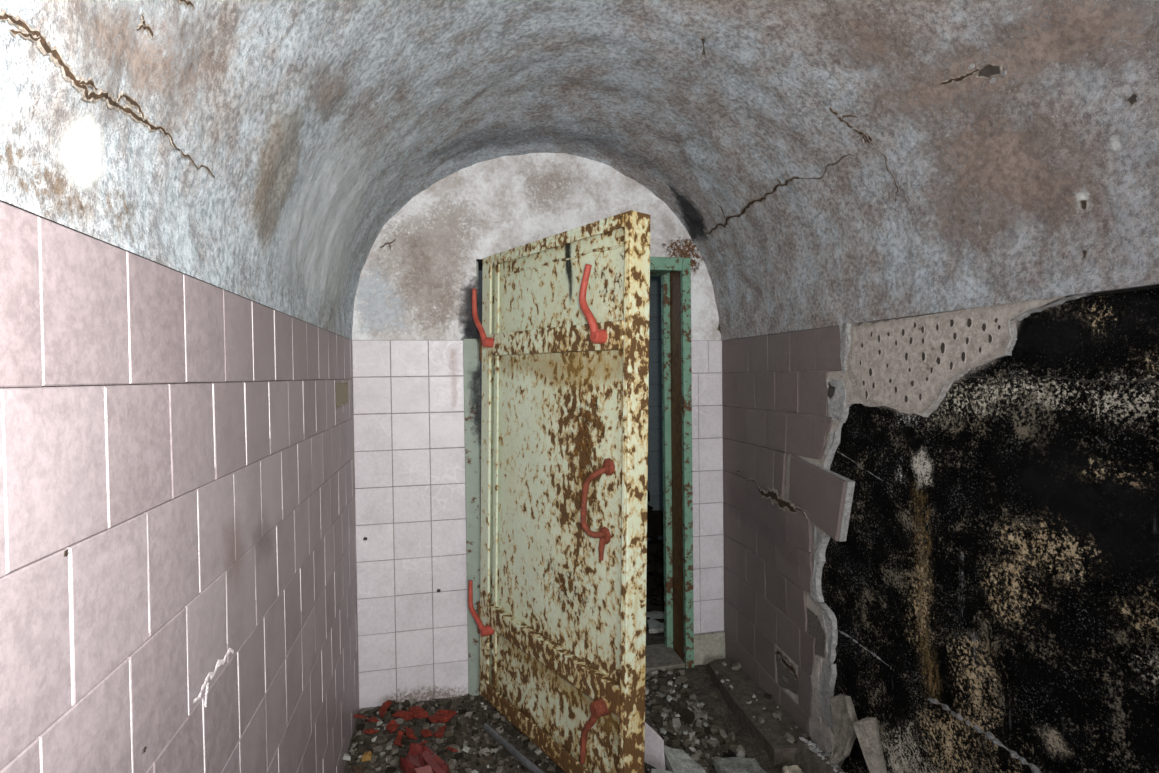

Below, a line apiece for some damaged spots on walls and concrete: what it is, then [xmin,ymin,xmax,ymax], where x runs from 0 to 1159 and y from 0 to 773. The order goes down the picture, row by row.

crack [178,0,195,10]
crack [0,8,215,178]
crack [703,107,899,234]
leakage [669,186,707,239]
leakage [459,280,482,342]
leakage [896,450,932,486]
spalling [806,288,1159,773]